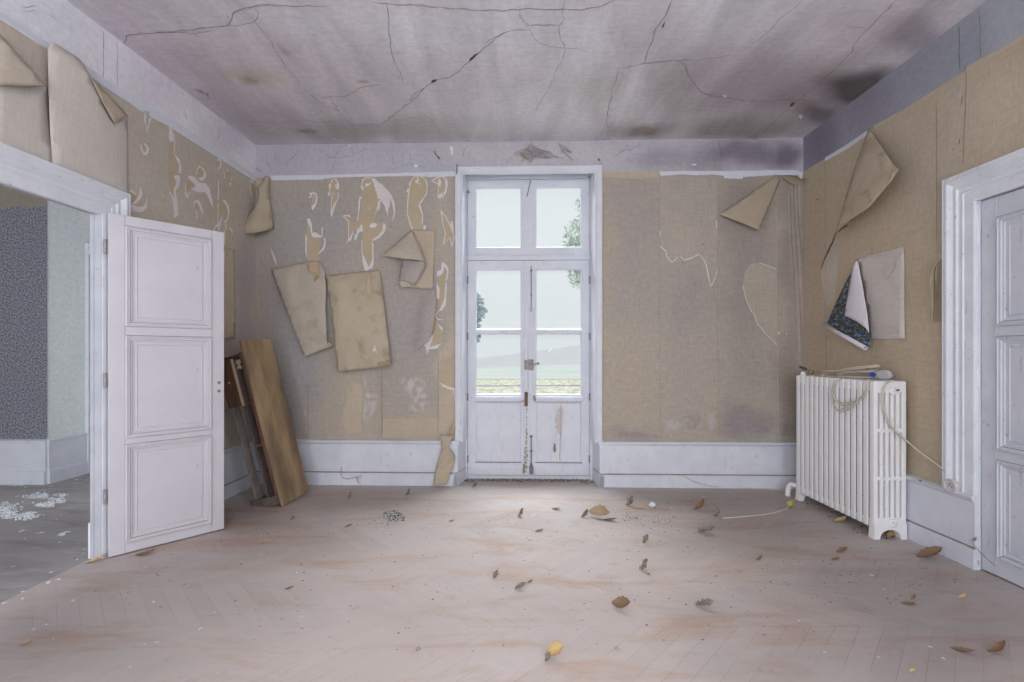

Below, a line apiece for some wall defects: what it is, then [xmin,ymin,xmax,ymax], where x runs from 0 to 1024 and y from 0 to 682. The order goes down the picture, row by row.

crack [103,0,614,171]
crack [600,0,897,159]
damp [845,72,880,102]
peeling [345,178,383,266]
peeling [408,146,458,230]